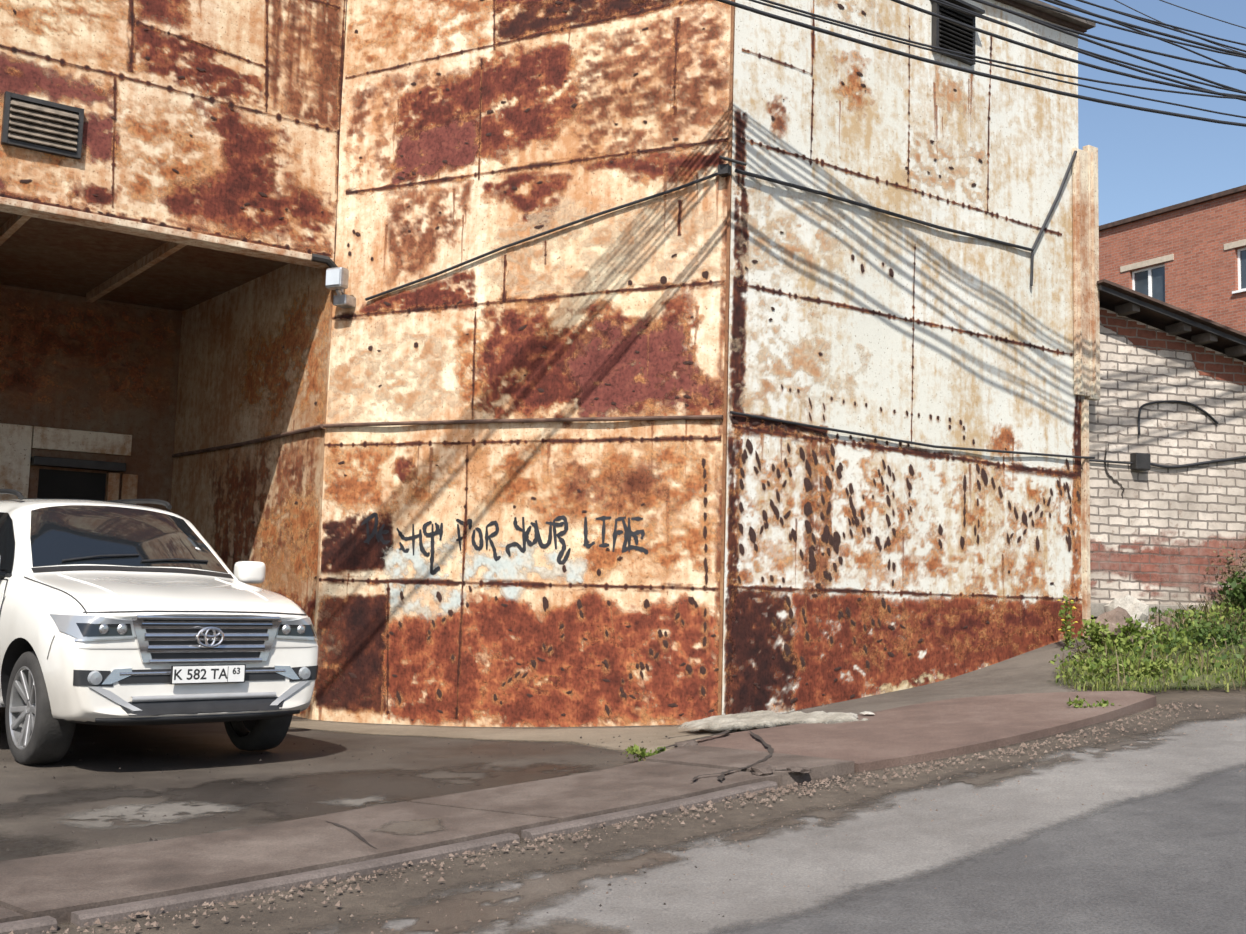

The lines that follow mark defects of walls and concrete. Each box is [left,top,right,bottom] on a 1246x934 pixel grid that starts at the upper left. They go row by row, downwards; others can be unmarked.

corrosion [0,0,1083,727]
peeling [1100,309,1246,386]
peeling [1090,536,1246,600]
crack [657,730,808,781]